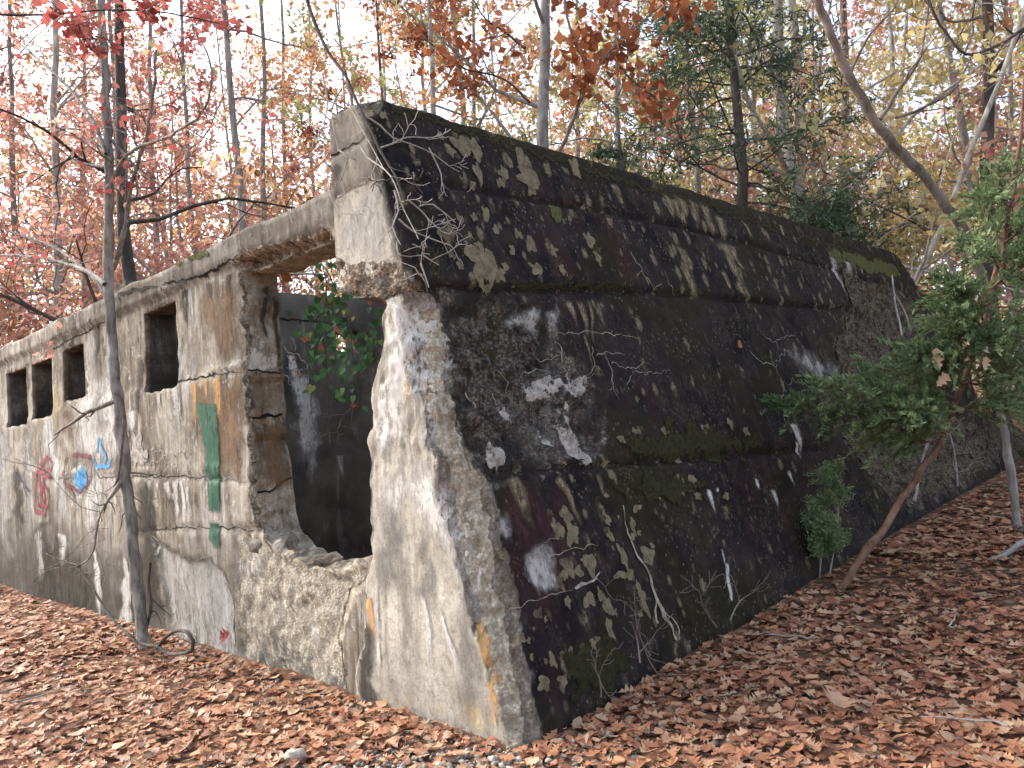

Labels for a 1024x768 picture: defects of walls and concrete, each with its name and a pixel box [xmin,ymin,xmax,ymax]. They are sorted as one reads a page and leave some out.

damp [0,436,101,615]
damp [44,324,117,535]
damp [119,558,131,621]
crack [58,475,292,493]
crack [142,525,252,533]
spalling [153,228,368,689]
crack [249,412,282,420]
rust [366,598,376,637]
spalling [417,306,584,746]
damp [465,368,592,471]
damp [722,550,733,601]
rust [477,621,501,726]